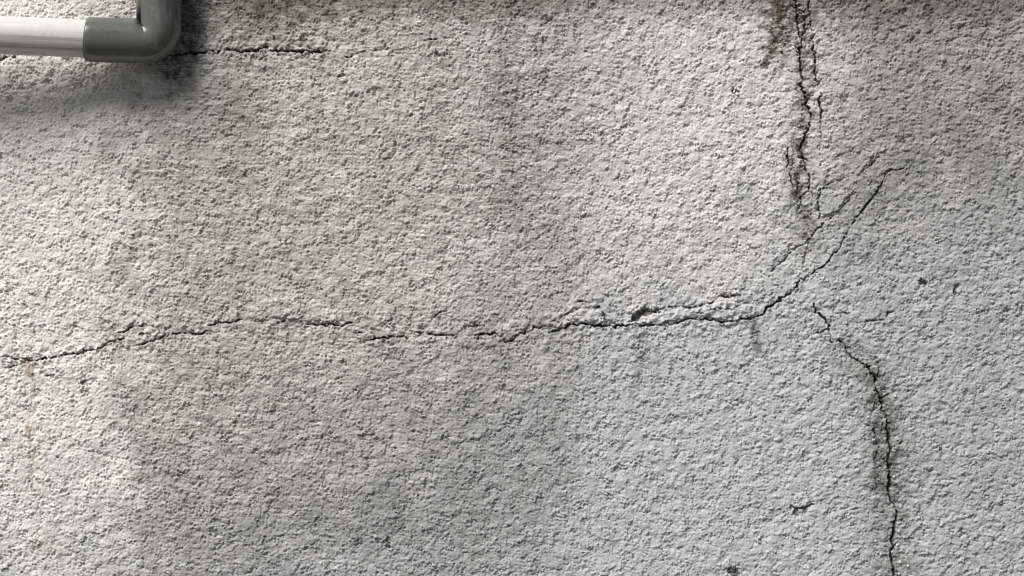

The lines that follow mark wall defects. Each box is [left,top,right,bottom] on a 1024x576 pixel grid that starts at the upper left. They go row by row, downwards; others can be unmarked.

crack [169,37,377,77]
crack [310,0,910,576]
crack [5,319,241,376]